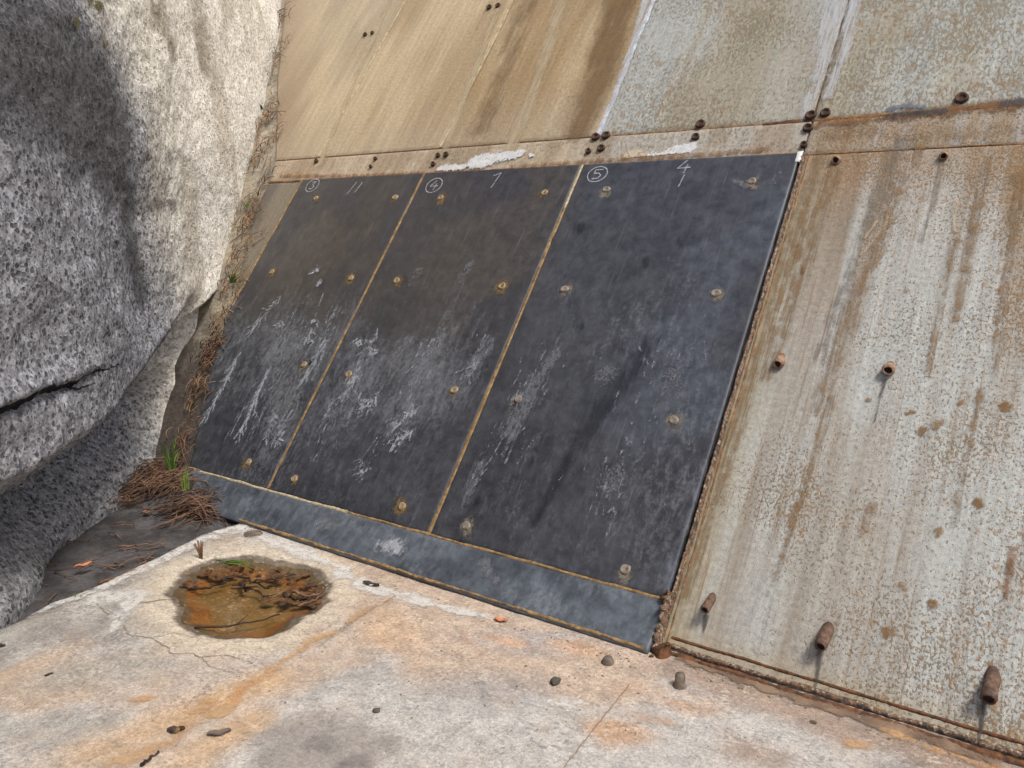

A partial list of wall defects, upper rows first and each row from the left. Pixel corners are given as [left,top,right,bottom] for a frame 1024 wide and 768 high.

corrosion [815,97,1024,138]
corrosion [945,157,992,321]
corrosion [708,152,840,506]
corrosion [780,350,841,559]
corrosion [917,419,944,435]
corrosion [958,389,984,458]
leakage [29,525,490,633]
corrosion [1004,546,1017,599]
crack [91,599,240,670]